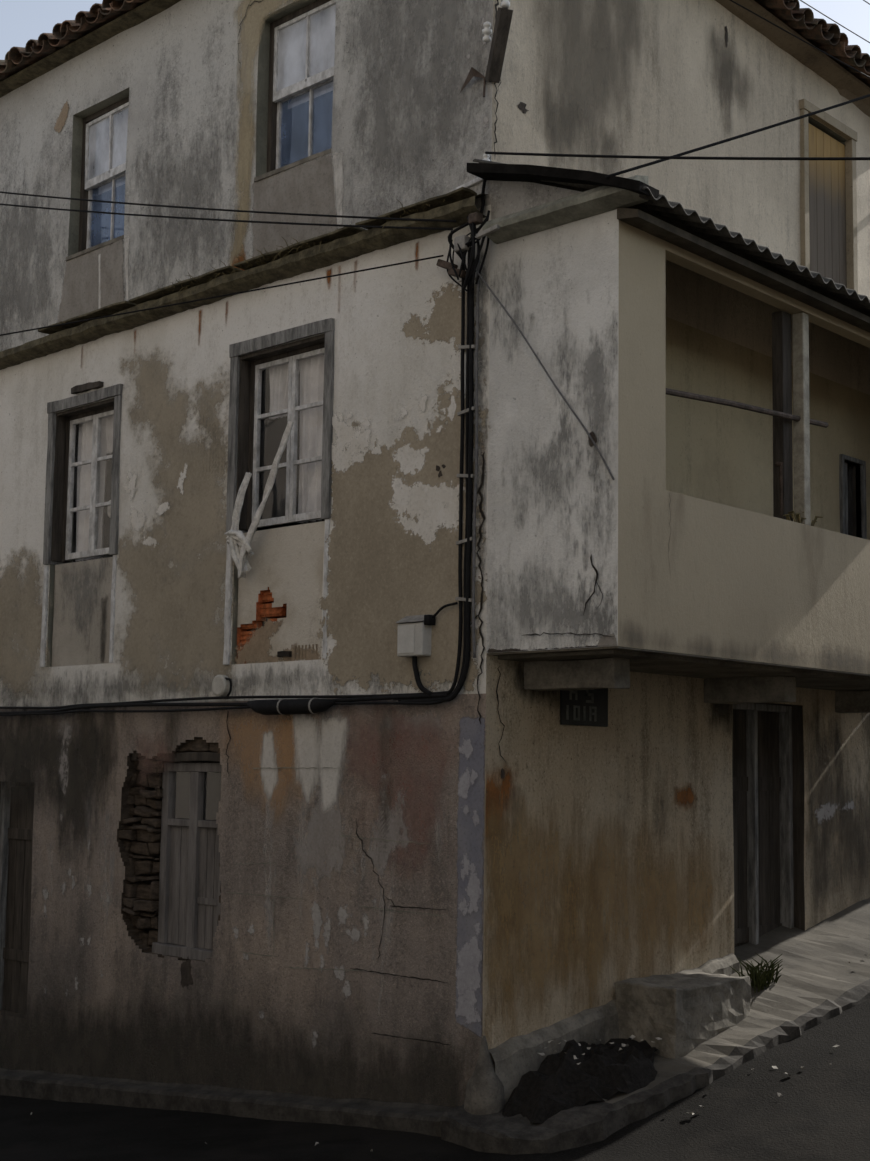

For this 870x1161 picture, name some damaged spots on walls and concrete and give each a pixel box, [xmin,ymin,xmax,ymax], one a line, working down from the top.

damp [547,0,639,155]
damp [712,34,746,117]
peeling [403,277,485,352]
peeling [117,355,617,694]
crack [522,554,614,637]
flaking render [118,737,221,957]
peeling [261,732,277,797]
peeling [293,710,356,886]
crack [356,821,395,958]
peeling [455,717,485,1037]
rust [485,768,511,895]
damp [0,1001,463,1108]